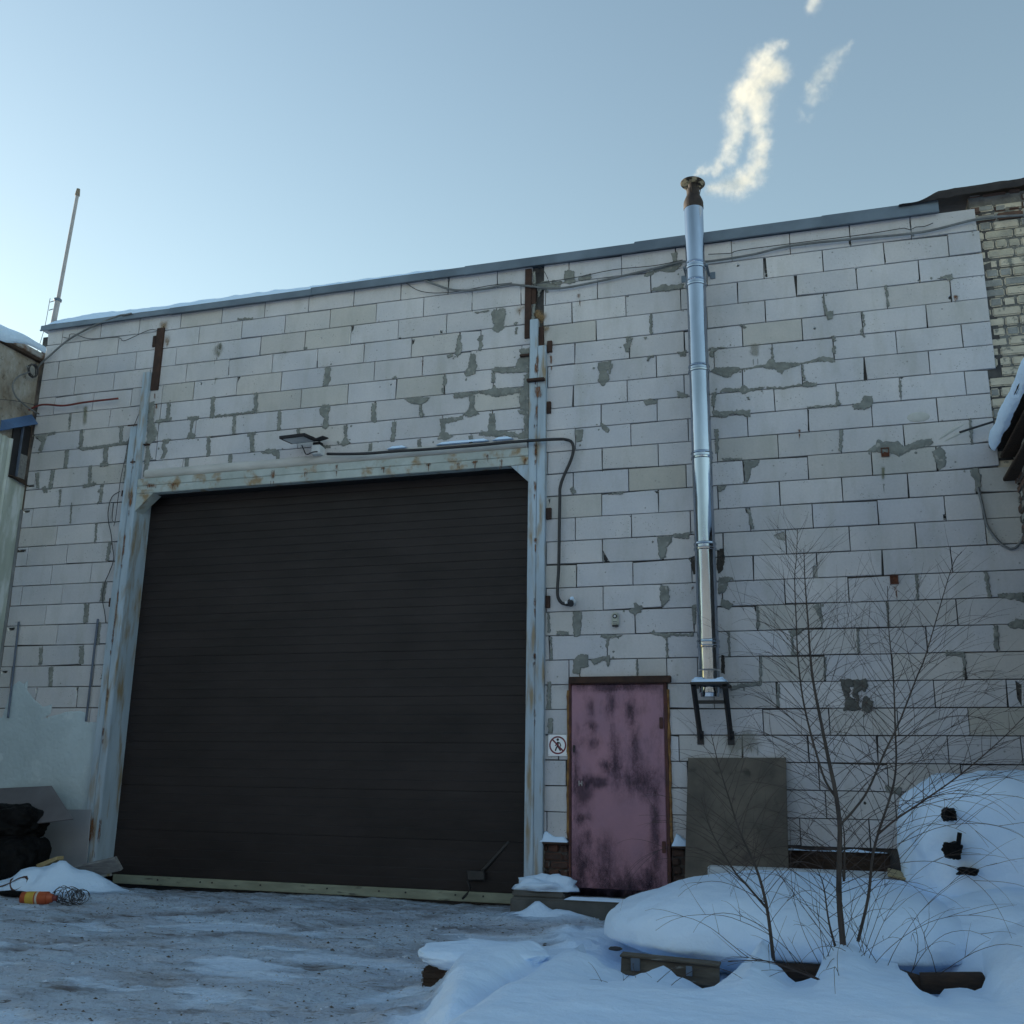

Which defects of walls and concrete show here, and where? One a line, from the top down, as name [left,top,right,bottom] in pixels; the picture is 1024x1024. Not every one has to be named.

rust [534,356,552,427]
peeling [852,678,874,717]